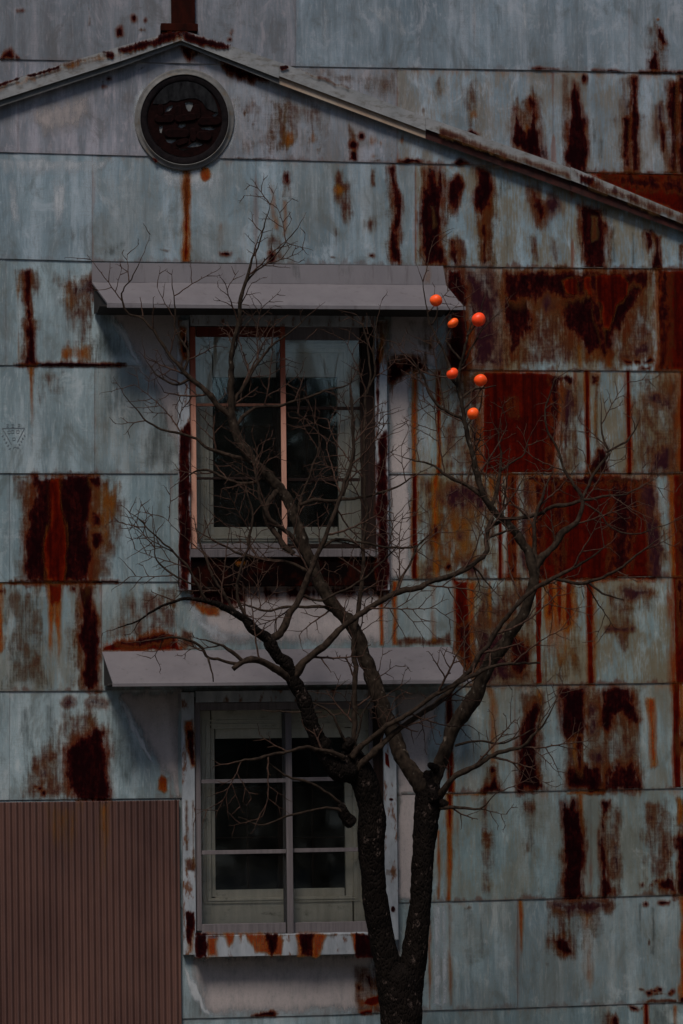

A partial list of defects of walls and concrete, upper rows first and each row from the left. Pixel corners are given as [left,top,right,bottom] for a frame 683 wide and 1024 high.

corrosion [182,167,210,263]
corrosion [439,18,683,223]
corrosion [18,269,39,402]
corrosion [14,472,193,826]
corrosion [379,165,683,1024]